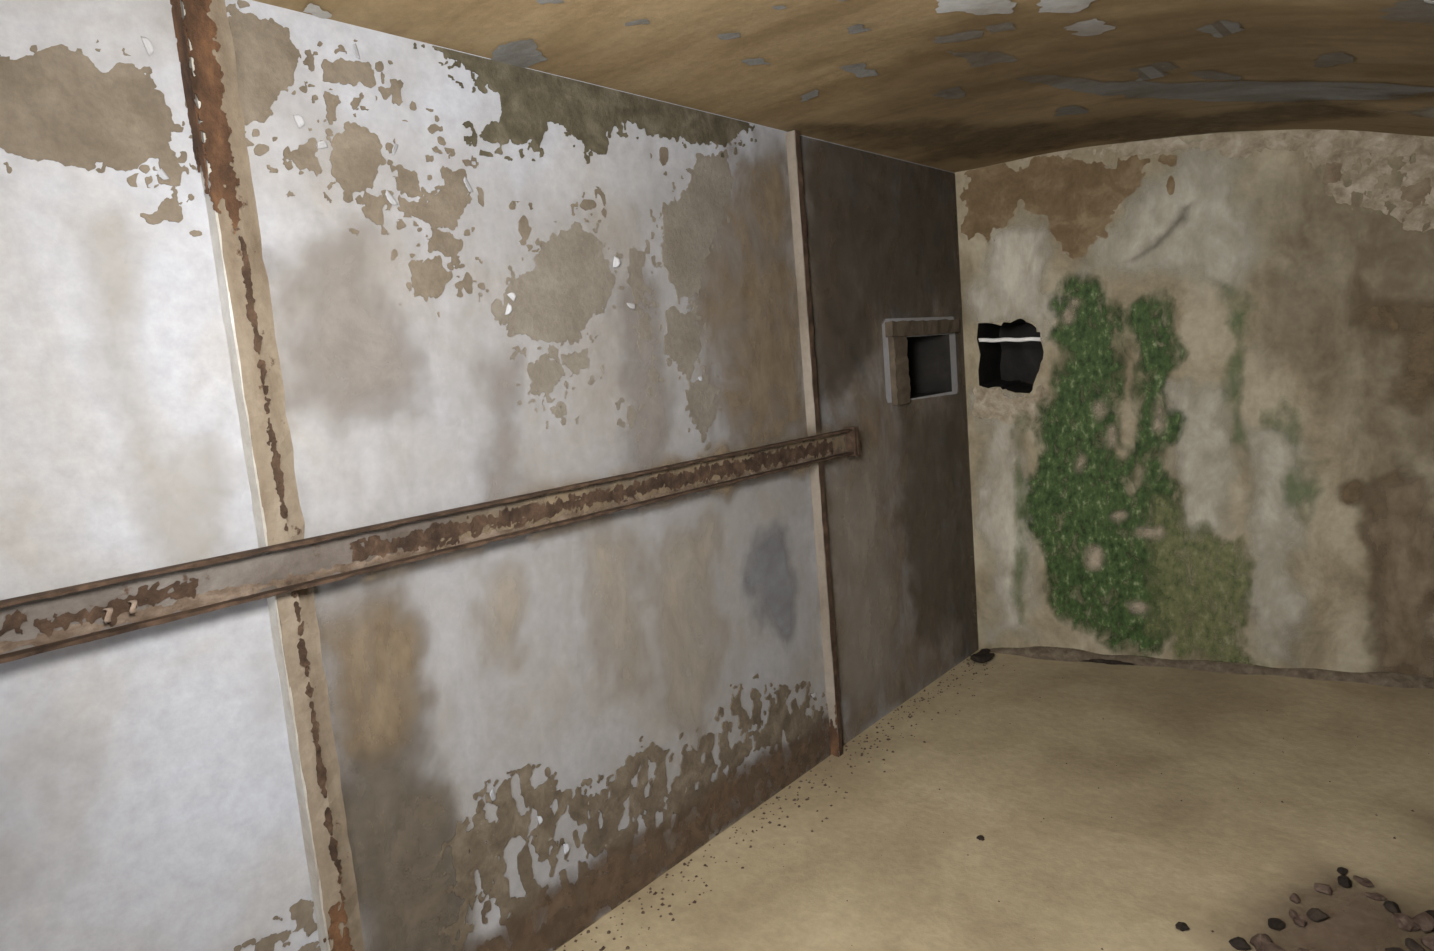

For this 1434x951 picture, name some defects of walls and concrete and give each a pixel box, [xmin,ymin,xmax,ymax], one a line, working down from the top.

peeling [933,0,1434,116]
peeling [0,36,202,237]
corrosion [170,0,288,531]
peeling [960,154,1177,259]
flaking render [1302,133,1434,232]
leakage [413,43,1434,742]
corrosion [350,423,849,578]
corrosion [0,578,199,637]
corrosion [290,590,355,951]
leakage [315,519,828,951]
peeling [234,899,321,951]